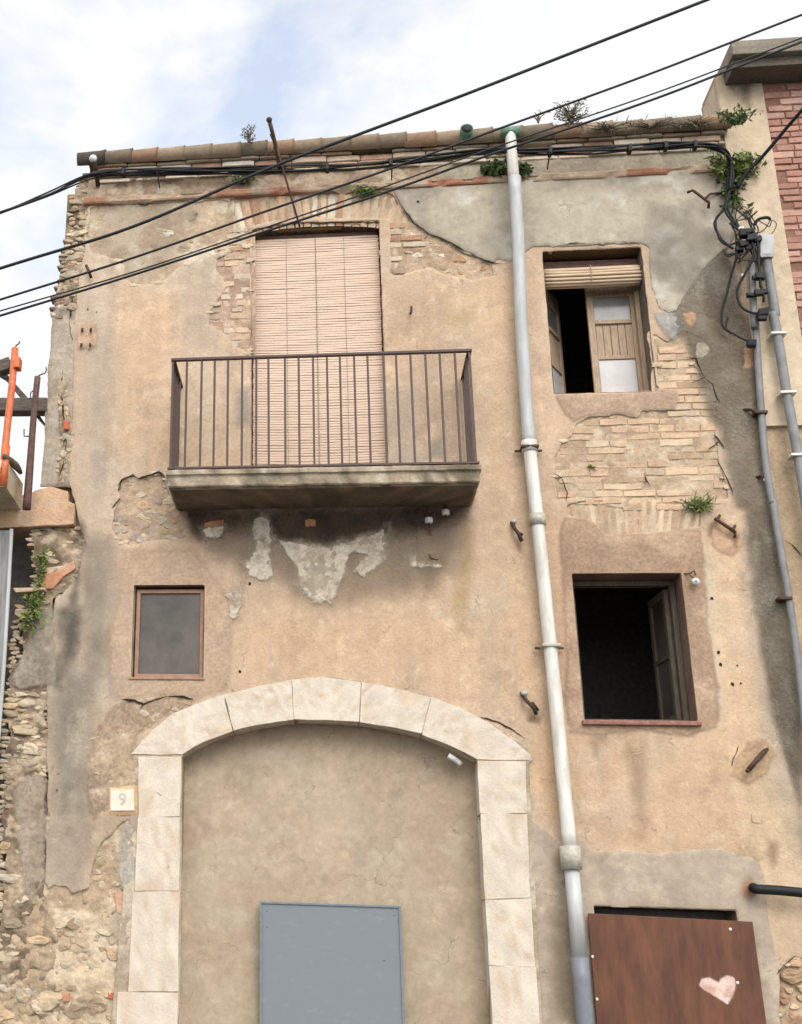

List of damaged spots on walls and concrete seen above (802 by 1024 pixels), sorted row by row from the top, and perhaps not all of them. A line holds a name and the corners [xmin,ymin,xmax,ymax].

spalling [49,173,493,356]
spalling [55,373,75,484]
spalling [551,331,735,535]
crack [689,357,720,402]
crack [709,434,733,493]
peeling [224,514,389,619]
leakage [676,251,800,788]
crack [123,695,193,707]
spalling [0,526,87,1024]